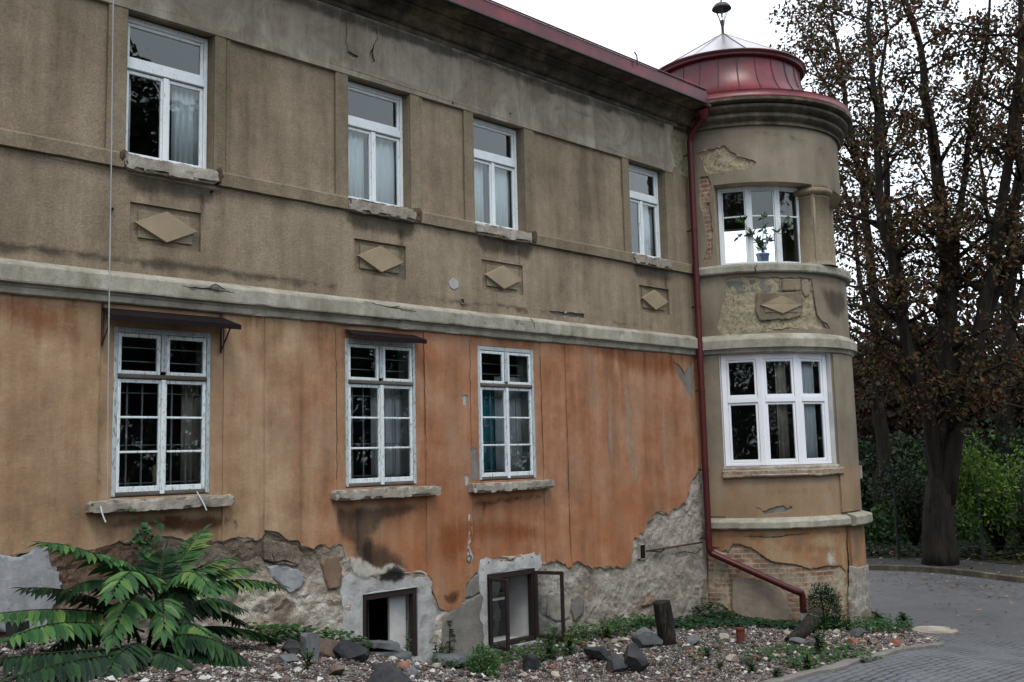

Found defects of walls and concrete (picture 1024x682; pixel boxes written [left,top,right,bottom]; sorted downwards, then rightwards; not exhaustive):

crack [345,19,378,62]
flaking render [671,127,756,264]
crack [183,284,234,293]
flaking render [718,276,825,335]
flaking render [0,530,388,641]
damp [342,507,409,577]
flaking render [403,570,451,653]
flaking render [491,462,872,642]